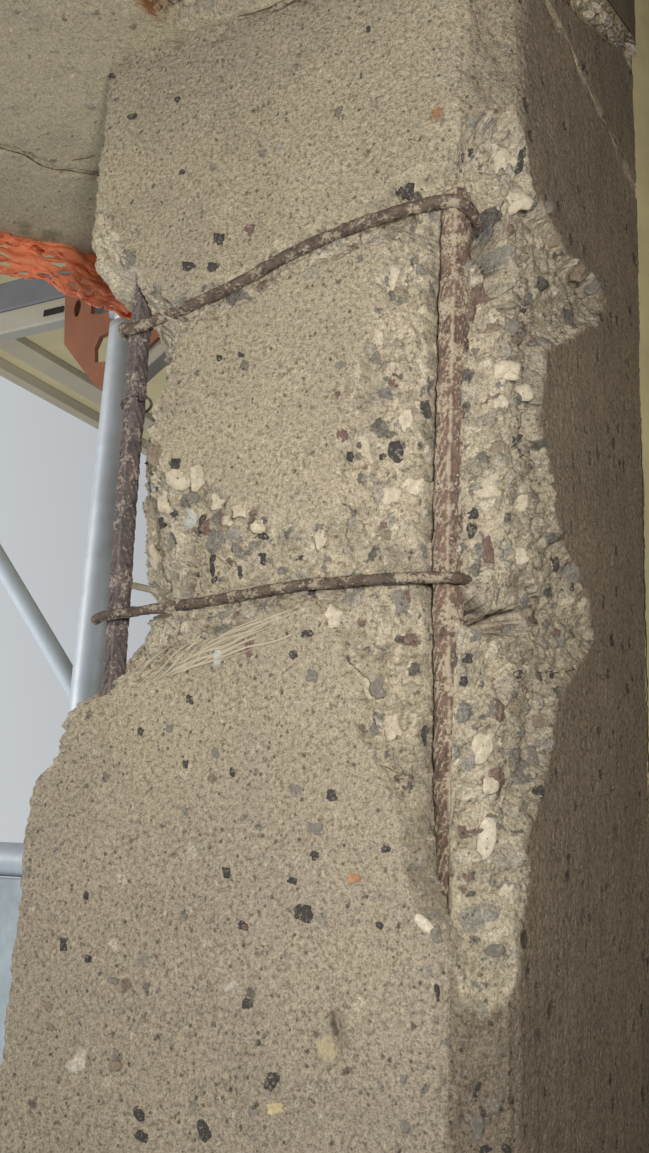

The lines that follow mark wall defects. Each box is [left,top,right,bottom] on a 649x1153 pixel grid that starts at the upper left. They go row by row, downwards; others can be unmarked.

spalling [154,0,281,25]
spalling [564,0,636,73]
crack [0,147,99,176]
spalling [35,104,608,1021]